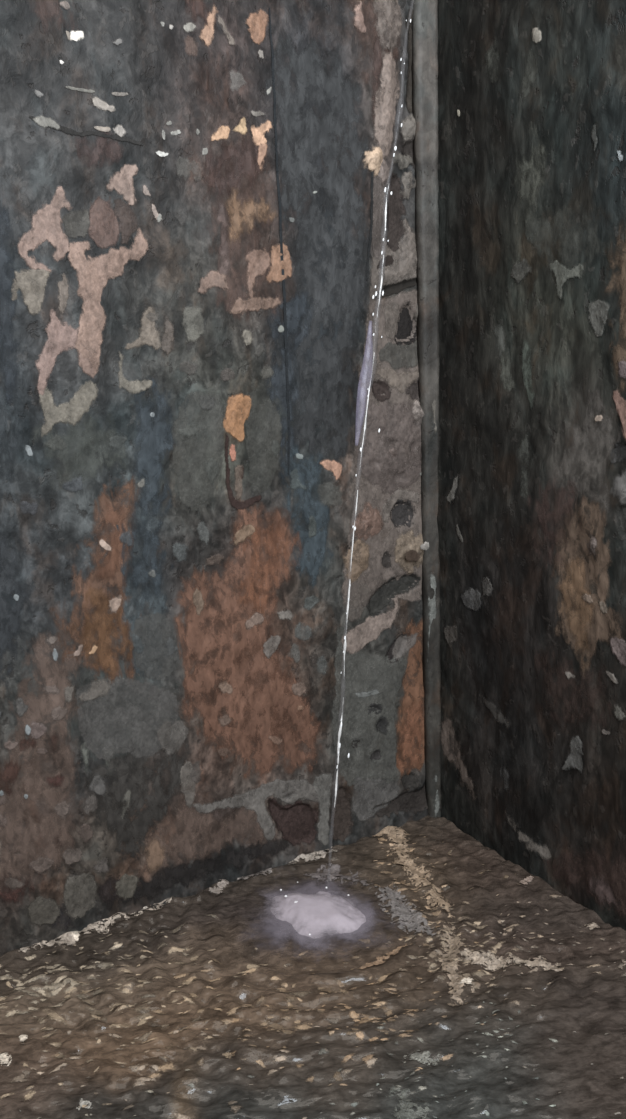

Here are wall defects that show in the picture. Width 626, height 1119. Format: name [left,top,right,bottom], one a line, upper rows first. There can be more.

peeling [161,6,235,55]
peeling [247,10,268,58]
spalling [406,8,414,113]
peeling [156,111,271,181]
peeling [12,165,162,451]
peeling [198,244,292,314]
crack [269,7,290,474]
crack [366,170,417,299]
peeling [234,524,255,545]
peeling [263,173,428,846]
water stain [427,574,437,661]
water stain [0,711,561,1006]